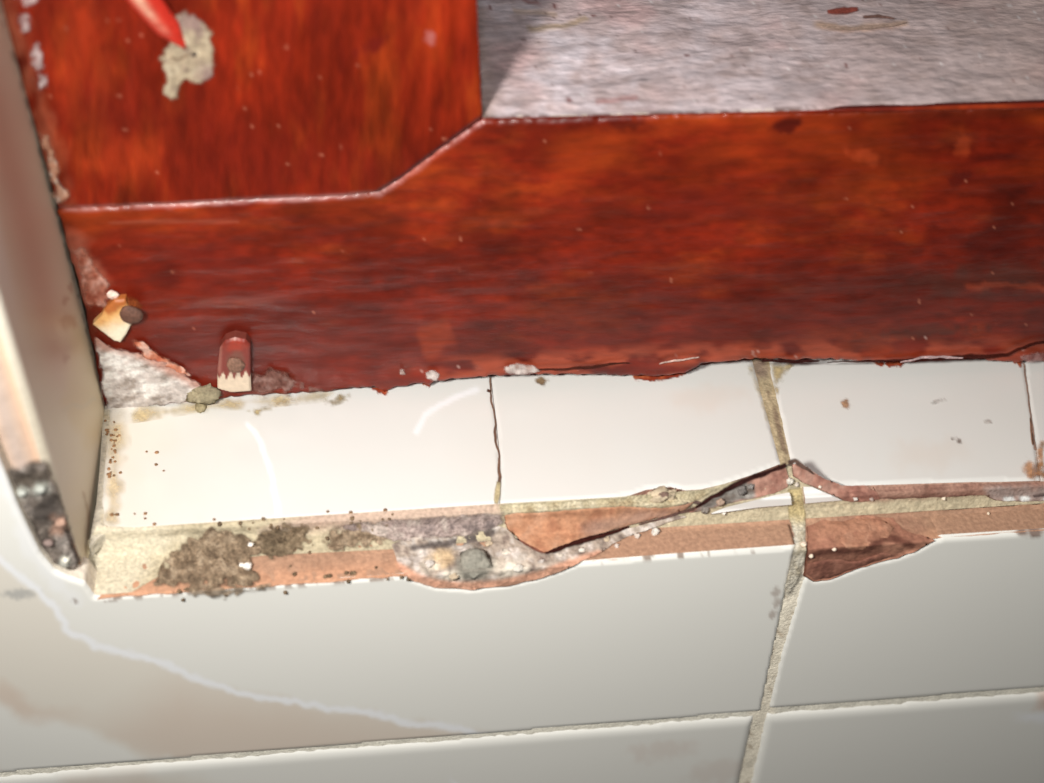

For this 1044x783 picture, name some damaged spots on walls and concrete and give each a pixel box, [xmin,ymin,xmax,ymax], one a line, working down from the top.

peeling [75,248,108,306]
peeling [95,338,200,409]
crack [762,341,1044,449]
crack [487,377,814,554]
spalling [343,464,1044,590]